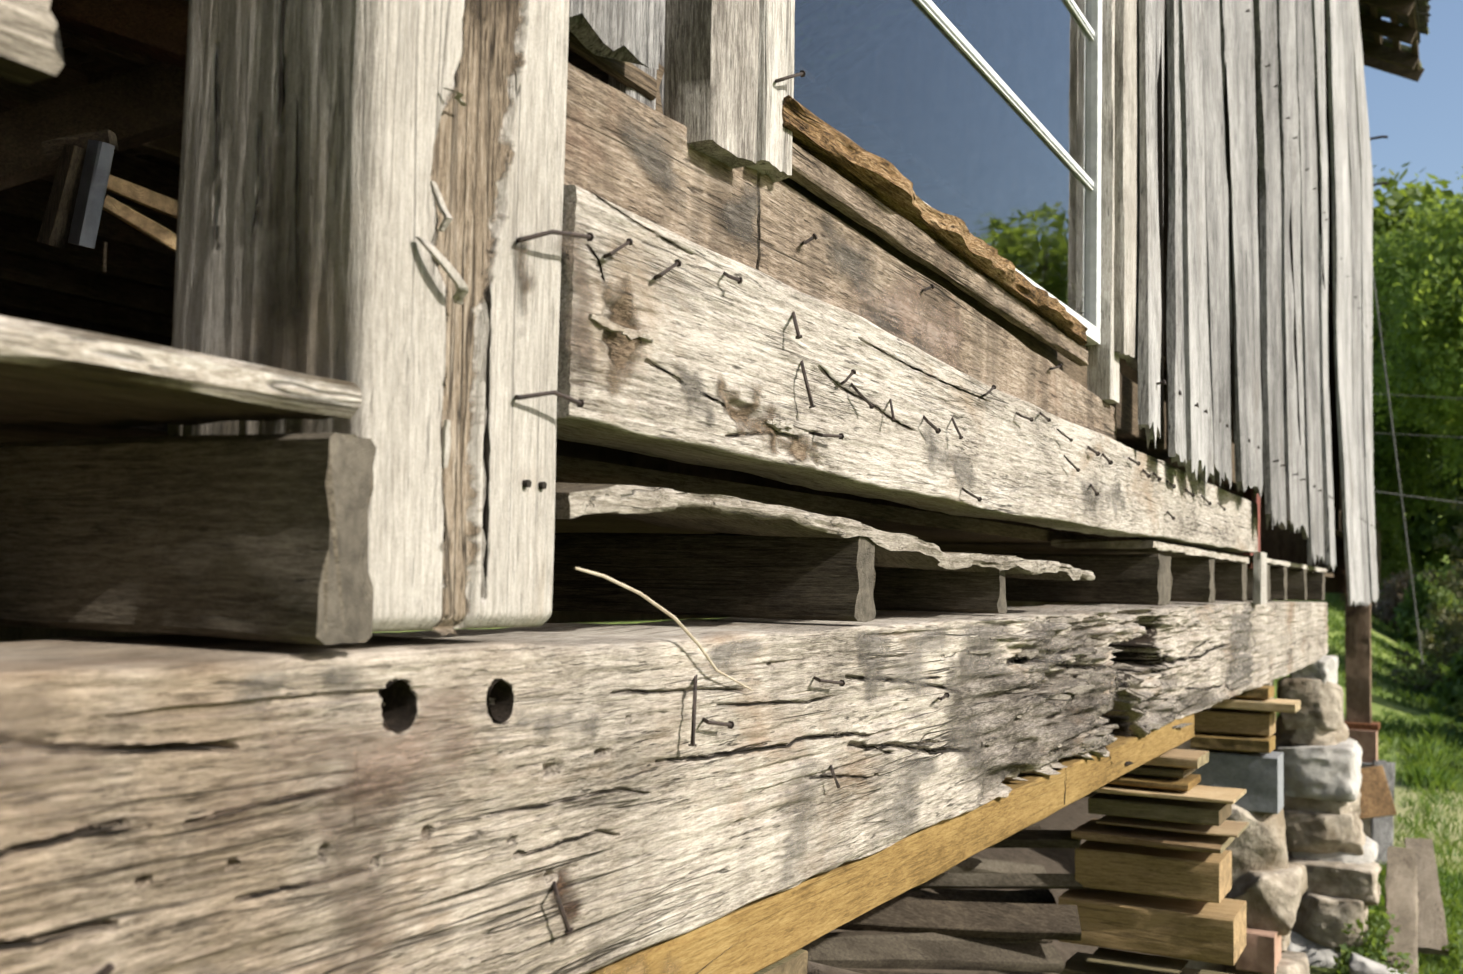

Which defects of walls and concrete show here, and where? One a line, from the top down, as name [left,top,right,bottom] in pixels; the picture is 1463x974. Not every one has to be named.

crack [482,279,492,589]
spalling [951,614,1120,791]
spalling [1139,688,1223,734]
crack [0,735,237,753]
crack [489,677,972,816]
crack [190,753,358,824]
crack [0,822,149,857]
crack [522,831,619,855]
crack [241,869,373,900]
corrosion [552,871,579,920]
crack [0,924,116,949]